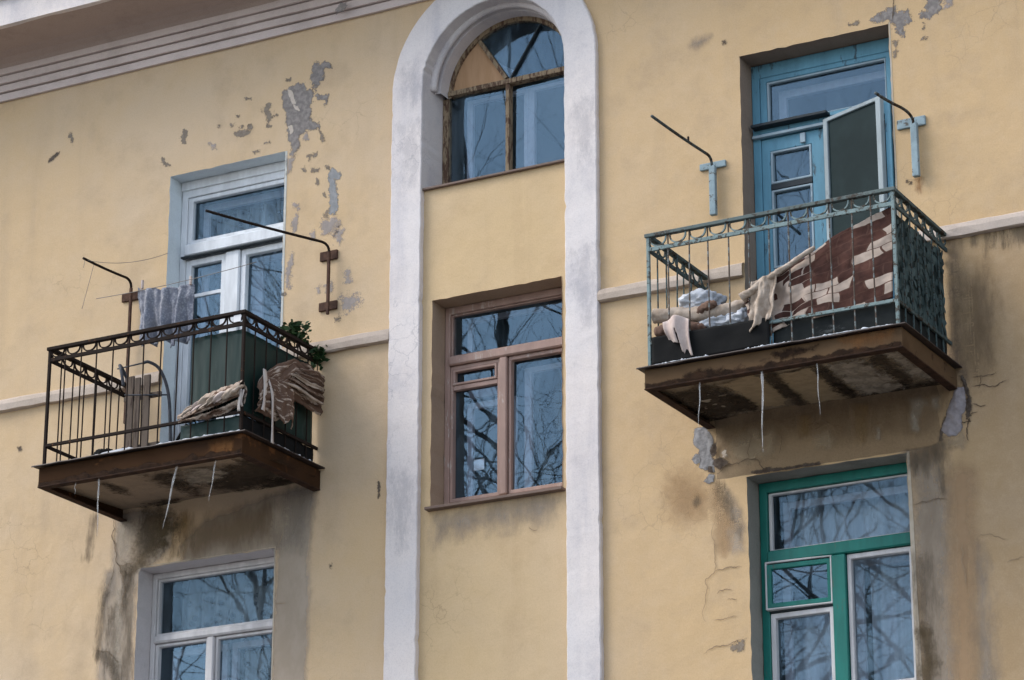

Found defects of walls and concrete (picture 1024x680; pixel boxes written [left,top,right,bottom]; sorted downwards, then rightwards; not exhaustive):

peeling [848,0,953,58]
peeling [218,115,253,137]
peeling [261,61,345,243]
peeling [316,270,360,323]
corrosion [645,332,901,388]
spalling [671,351,941,484]
spalling [939,375,972,446]
crack [962,372,1006,442]
damp [122,458,313,680]
crack [702,527,741,651]
damp [912,446,954,680]